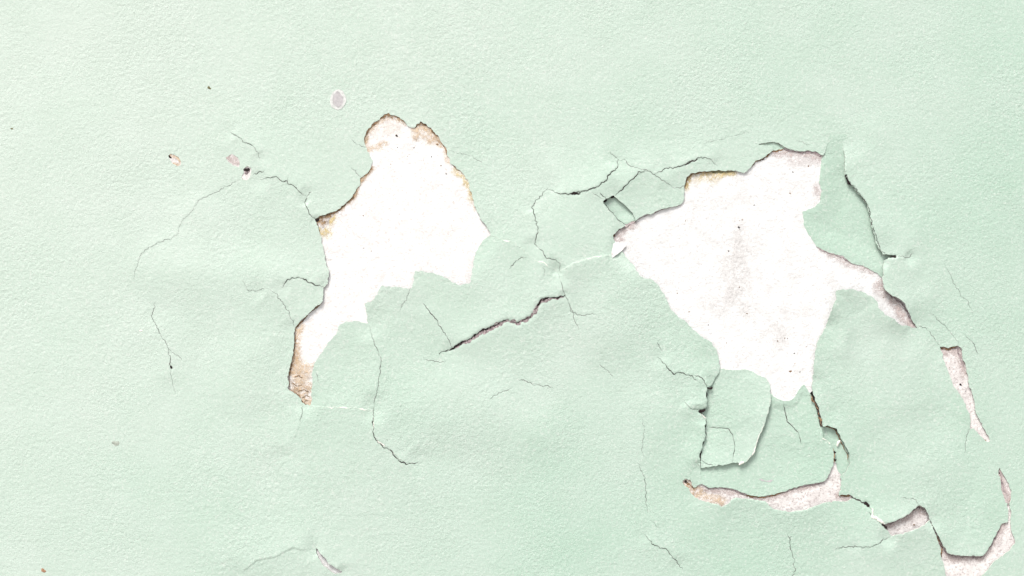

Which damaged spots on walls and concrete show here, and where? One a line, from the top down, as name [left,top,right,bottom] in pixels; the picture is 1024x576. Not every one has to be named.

crack [248,277,319,320]
peeling [288,114,490,404]
crack [400,134,739,363]
peeling [611,148,917,468]
crack [845,175,911,258]
crack [300,331,415,465]
peeling [942,346,989,442]
peeling [682,462,852,512]
peeling [886,468,1015,576]